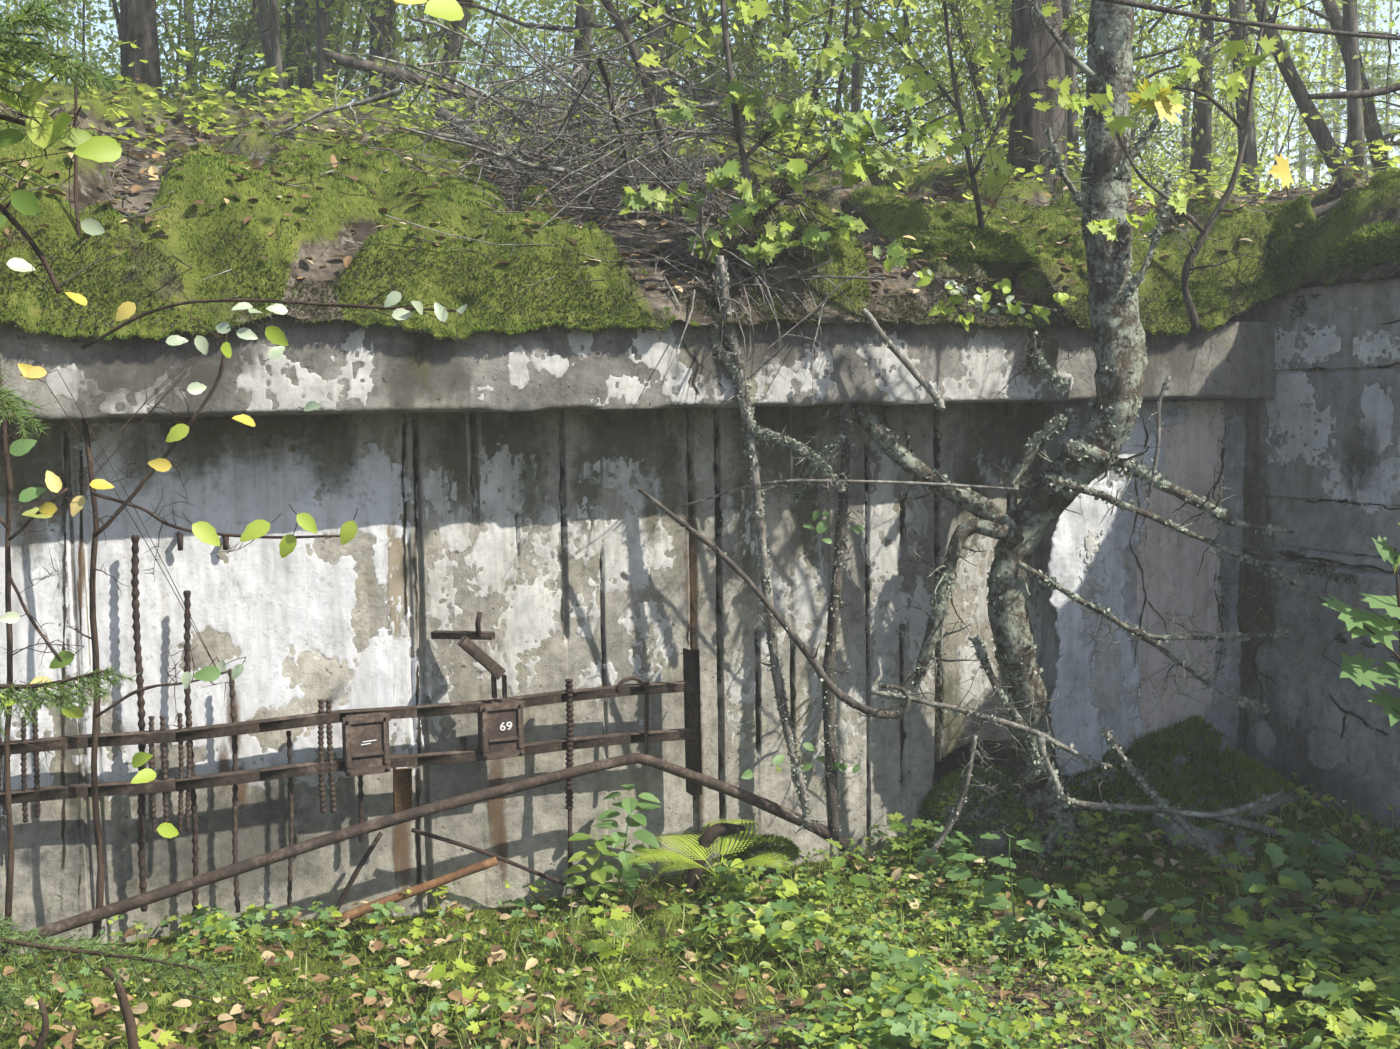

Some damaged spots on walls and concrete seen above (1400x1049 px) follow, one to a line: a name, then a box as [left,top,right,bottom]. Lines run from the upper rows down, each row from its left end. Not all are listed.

peeling [235,328,375,412]
peeling [507,328,594,390]
peeling [589,326,836,407]
peeling [1262,322,1400,514]
peeling [0,364,677,831]
spalling [1079,400,1226,753]